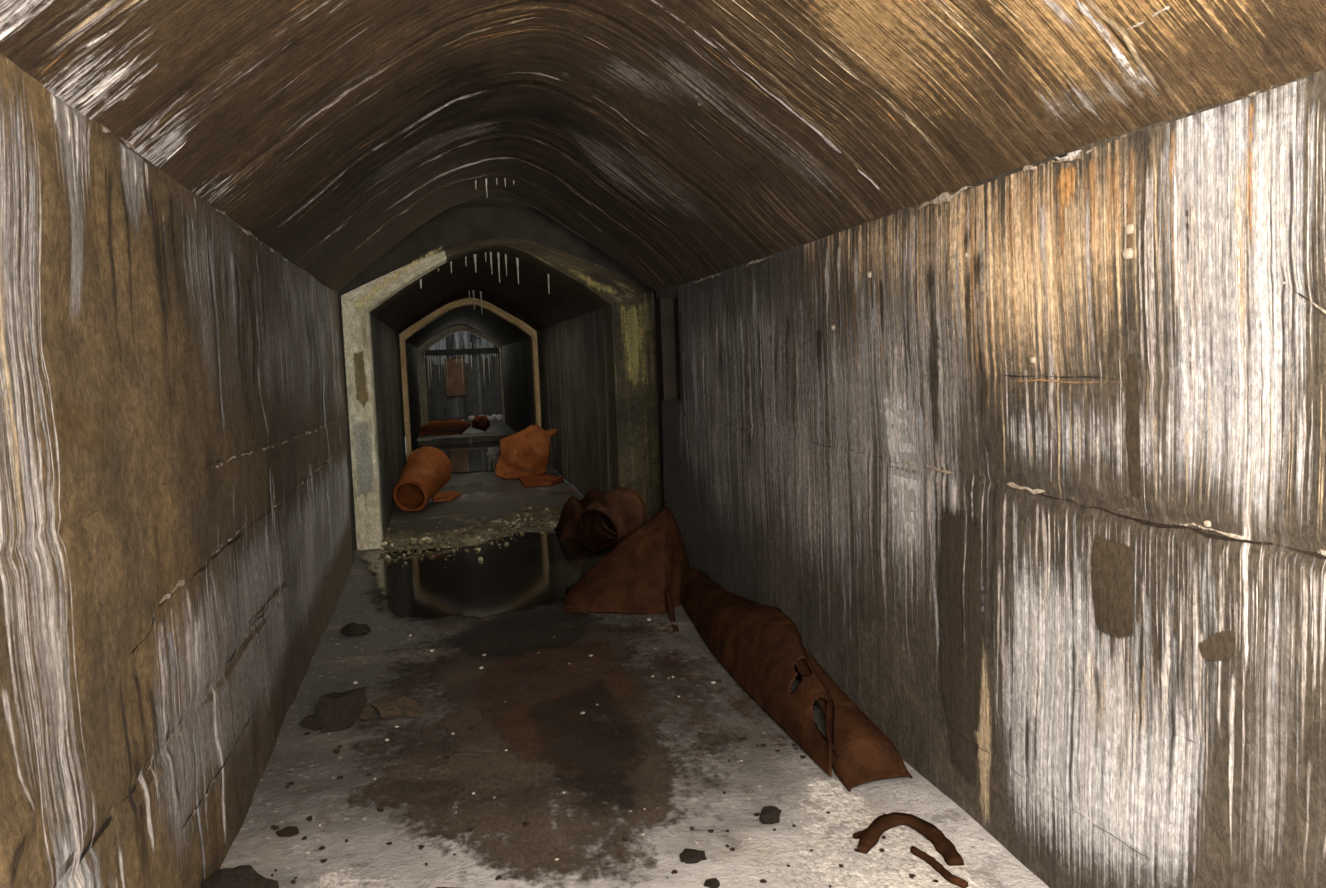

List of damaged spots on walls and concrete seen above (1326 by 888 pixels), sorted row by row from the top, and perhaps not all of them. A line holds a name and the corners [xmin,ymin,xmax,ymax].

water stain [0,0,54,41]
water stain [277,19,393,166]
water stain [0,101,102,888]
water stain [44,0,373,879]
crack [700,420,954,474]
water stain [680,82,1326,888]
crack [1007,482,1326,559]
crack [65,599,275,888]
water stain [347,599,743,887]